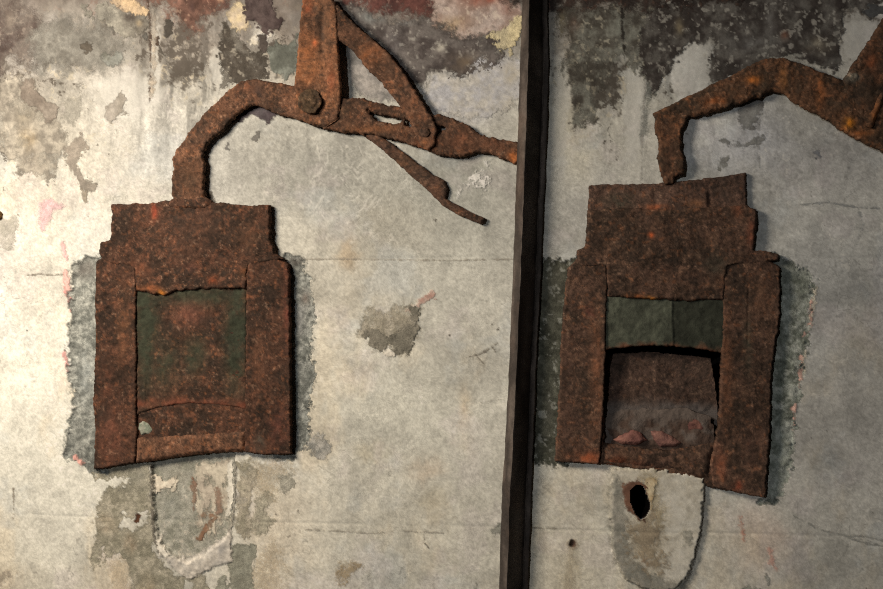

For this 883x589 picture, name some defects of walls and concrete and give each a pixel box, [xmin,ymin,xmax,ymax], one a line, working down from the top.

water stain [104,90,127,123]
water stain [0,73,97,203]
water stain [456,160,491,199]
spalling [622,478,657,522]